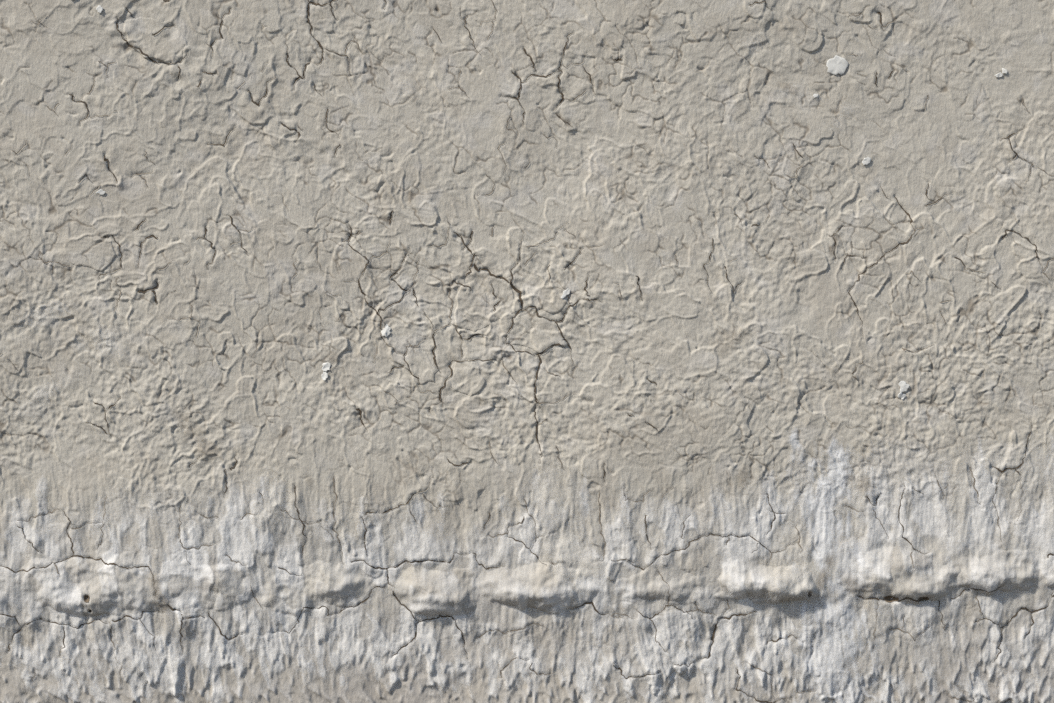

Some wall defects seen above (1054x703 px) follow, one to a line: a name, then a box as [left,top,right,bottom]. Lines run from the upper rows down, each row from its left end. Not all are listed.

crack [46,0,231,154]
crack [237,0,359,158]
crack [481,33,595,196]
crack [98,215,252,340]
crack [326,211,642,469]
crack [828,183,947,333]
crack [1,496,241,682]
crack [178,442,572,655]
water stain [0,430,1054,703]
crack [571,463,819,679]
crack [858,586,1054,658]
crack [969,424,1032,542]